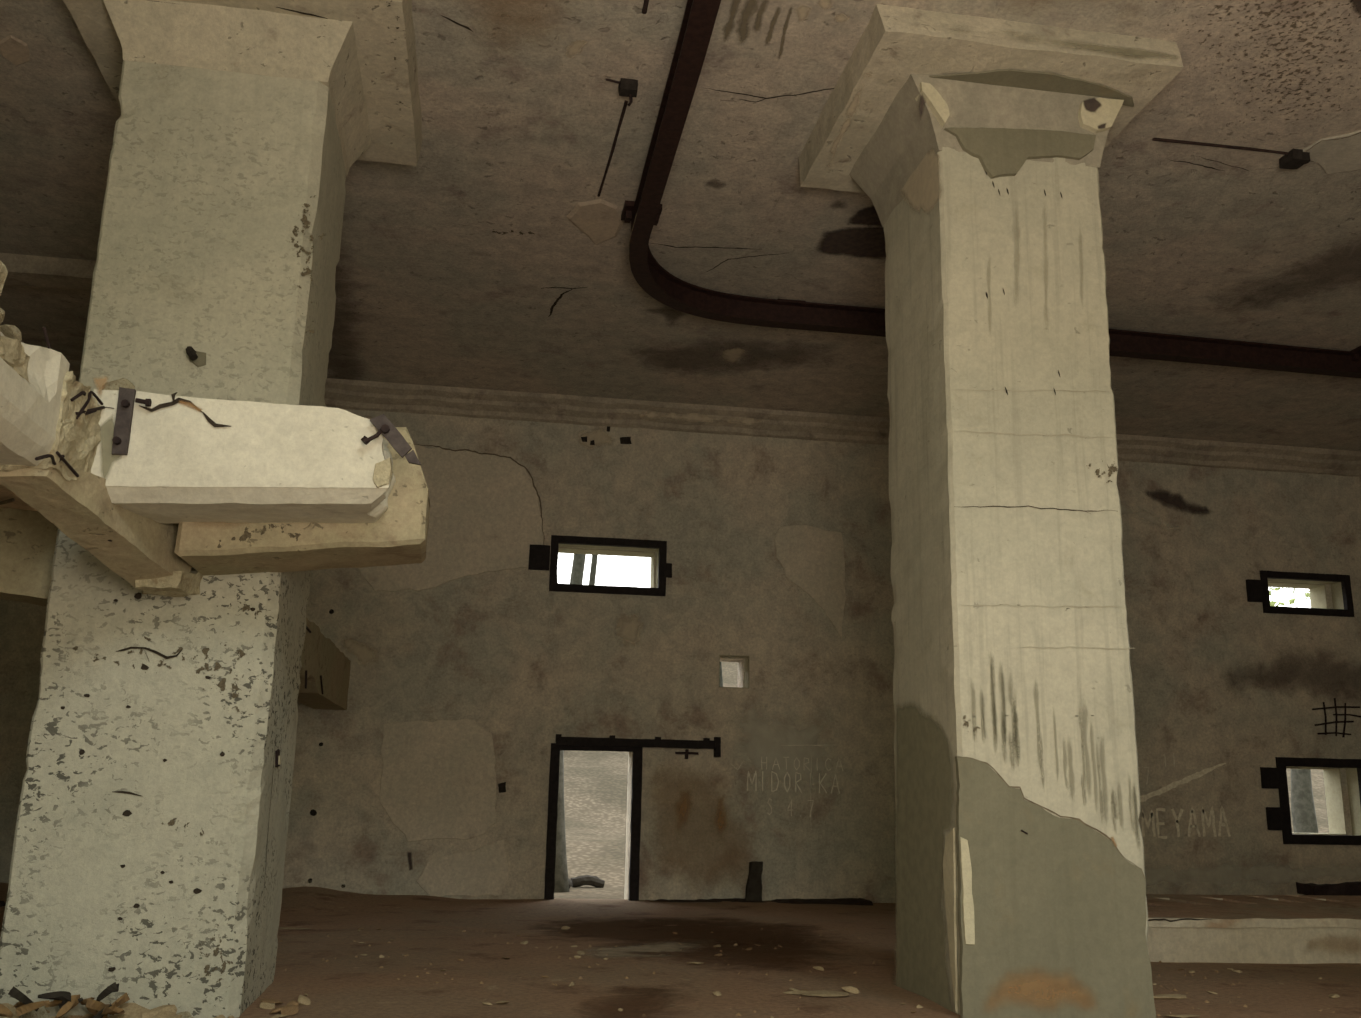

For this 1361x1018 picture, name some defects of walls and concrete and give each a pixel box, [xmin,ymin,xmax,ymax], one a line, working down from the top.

damp [724,0,847,57]
spalling [1183,0,1361,129]
peeling [915,69,1134,179]
spalling [901,150,940,211]
spalling [291,195,324,288]
spalling [70,391,105,419]
spalling [35,451,79,477]
spalling [218,524,301,548]
crack [967,505,1114,513]
peeling [895,705,1156,1018]
damp [541,919,828,970]
damp [594,988,669,1018]